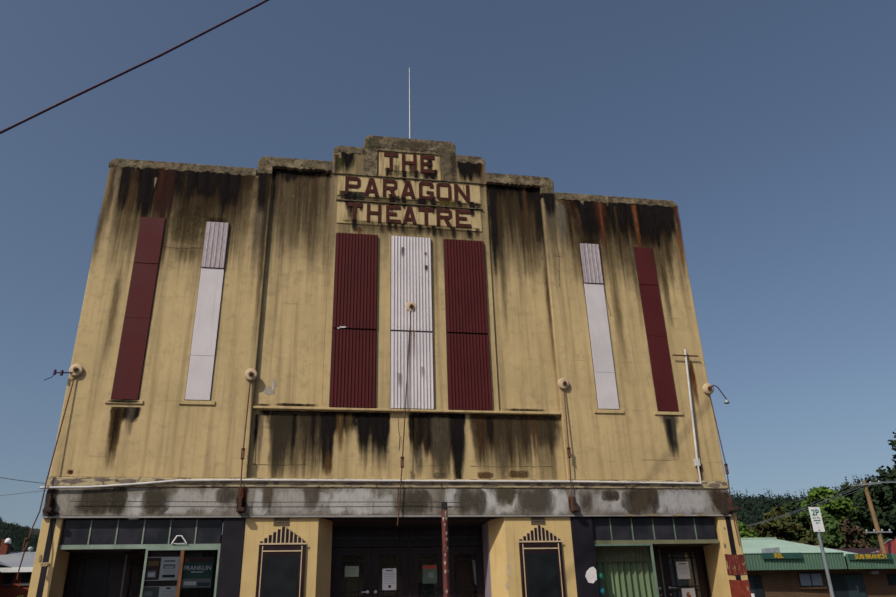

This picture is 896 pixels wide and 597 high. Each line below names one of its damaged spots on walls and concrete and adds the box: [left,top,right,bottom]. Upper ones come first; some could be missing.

water stain [385,151,482,183]
water stain [110,152,355,283]
water stain [340,191,365,227]
water stain [417,173,684,302]
water stain [108,400,141,456]
water stain [254,403,390,473]
water stain [409,408,729,515]
water stain [45,487,431,516]